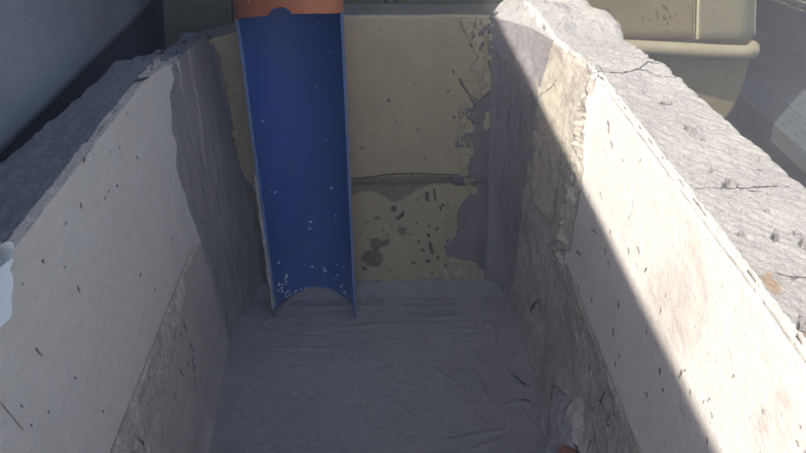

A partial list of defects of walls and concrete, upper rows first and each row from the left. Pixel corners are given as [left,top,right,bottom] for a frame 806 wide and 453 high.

crack [589,61,671,77]